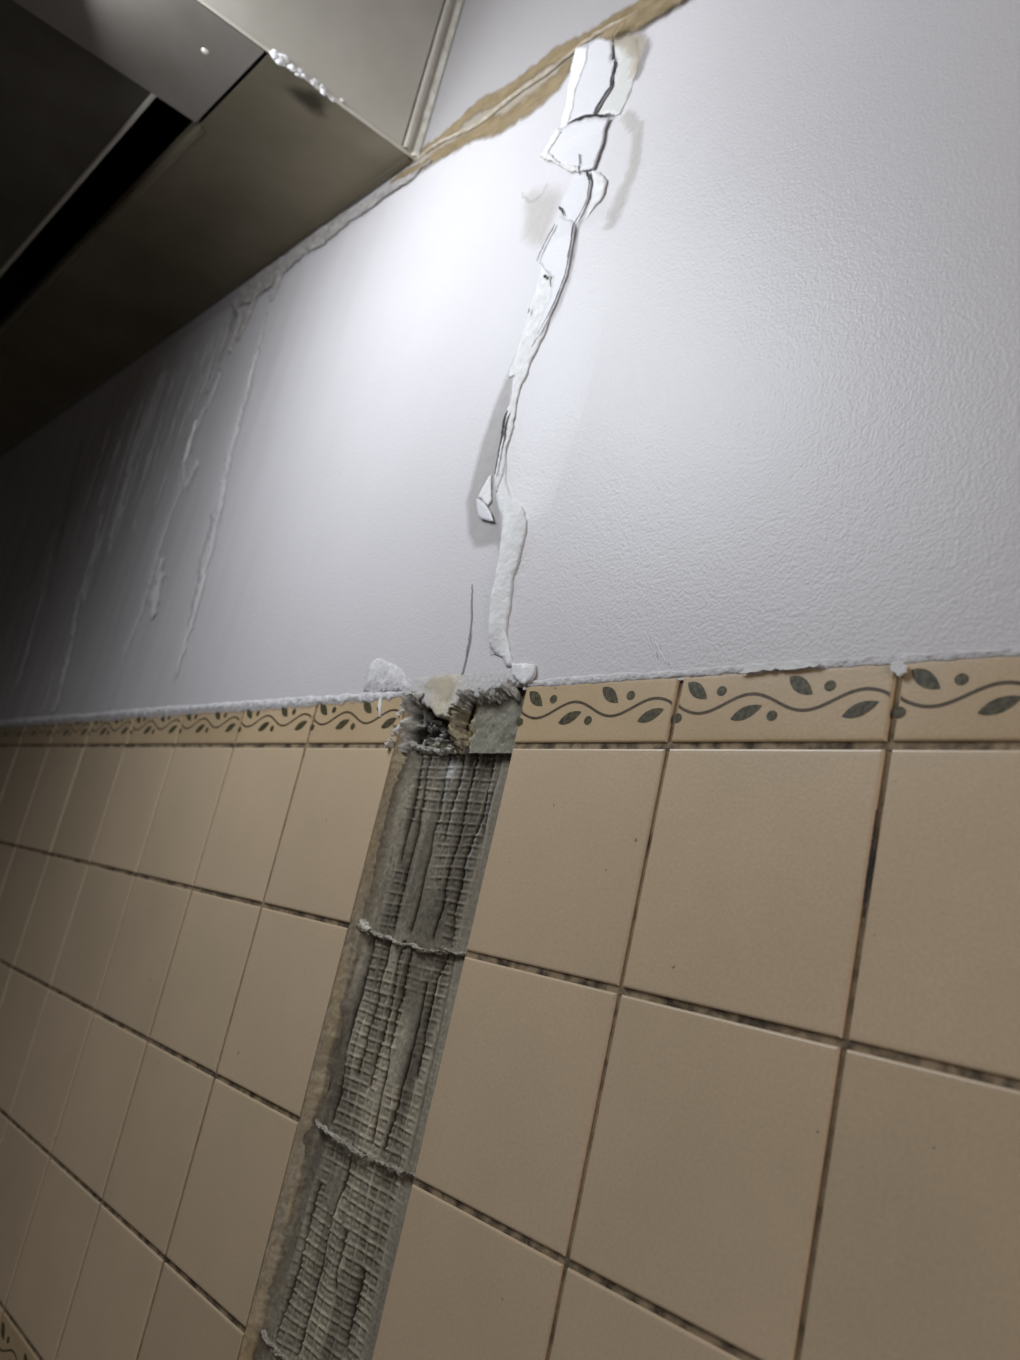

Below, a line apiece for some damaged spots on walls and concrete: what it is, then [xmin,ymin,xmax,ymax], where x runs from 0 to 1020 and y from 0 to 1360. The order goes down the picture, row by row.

leakage [42,314,233,714]
leakage [173,314,268,679]
crack [494,410,508,474]
peeling [0,33,1020,758]
crack [528,154,590,334]
crack [568,58,616,124]